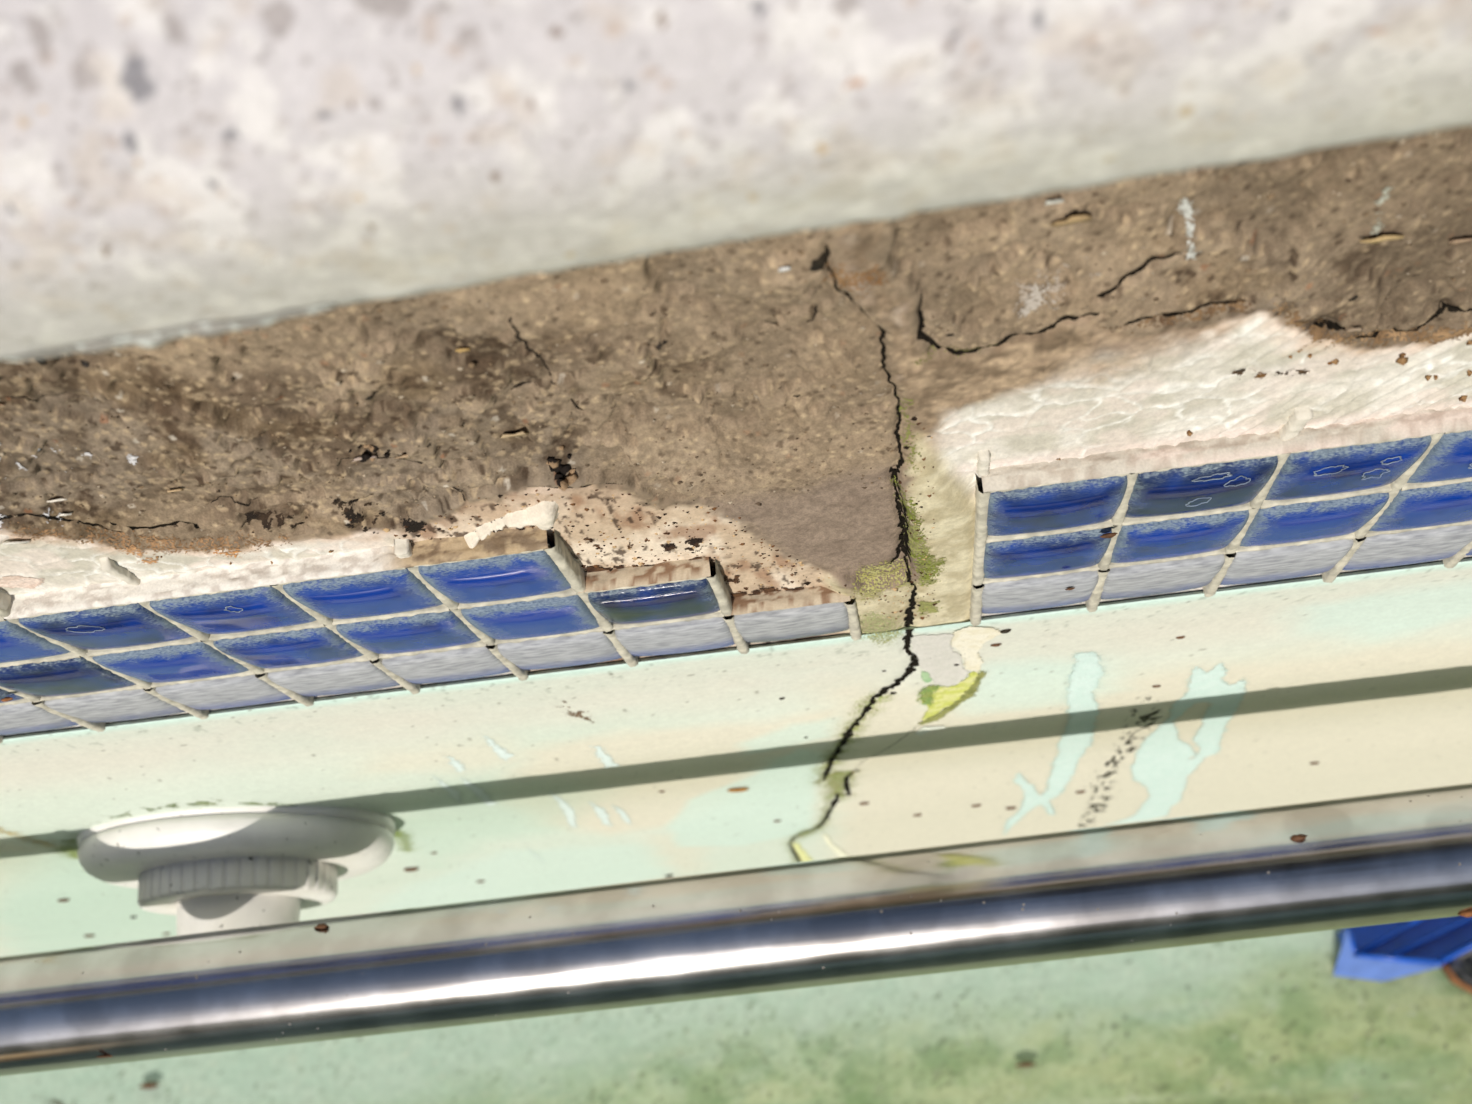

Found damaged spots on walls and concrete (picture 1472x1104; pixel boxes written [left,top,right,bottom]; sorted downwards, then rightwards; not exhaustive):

crack [1313,301,1472,339]
spalling [0,125,1472,610]
crack [0,496,257,532]
crack [764,244,1247,862]
peeling [695,630,850,652]
peeling [314,655,659,698]